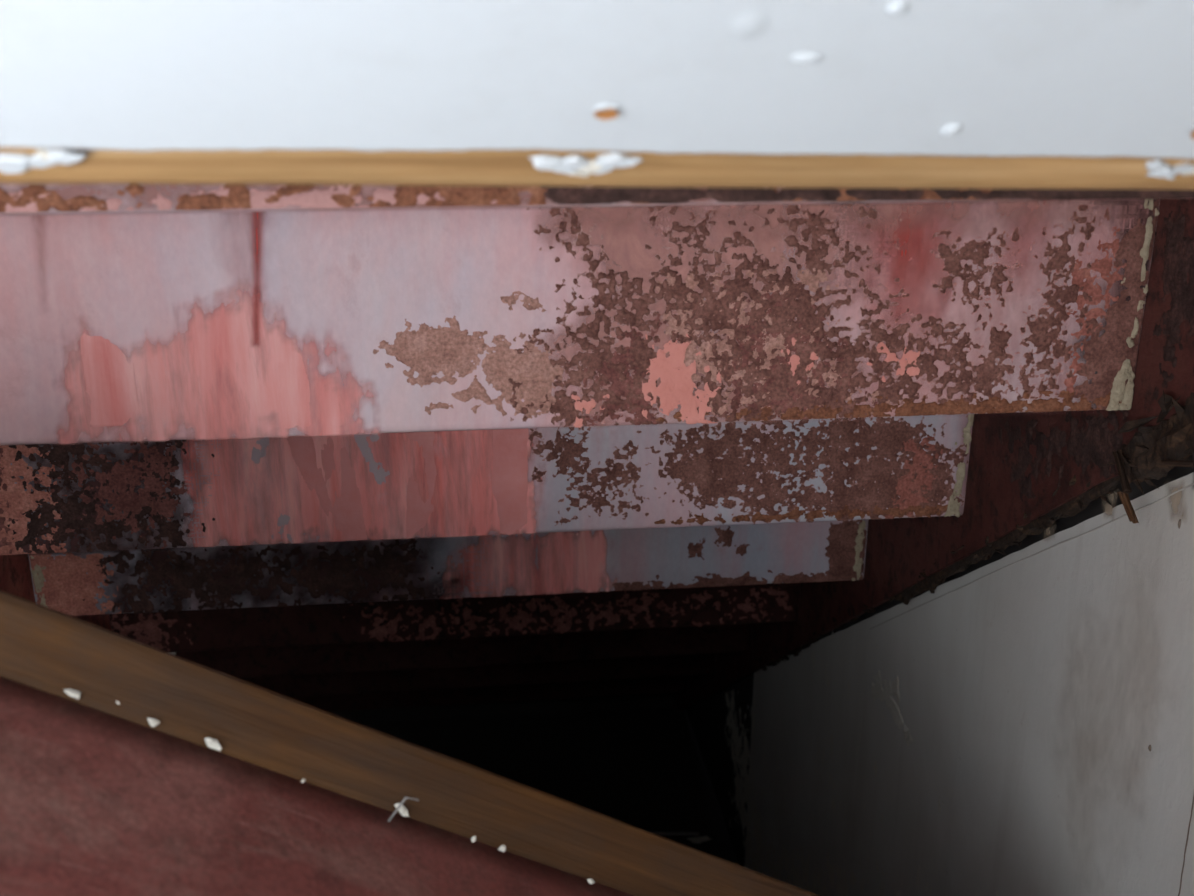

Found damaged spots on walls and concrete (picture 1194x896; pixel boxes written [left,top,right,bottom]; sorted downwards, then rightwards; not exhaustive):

peeling [58,290,616,599]
corrosion [0,184,1194,652]
peeling [642,334,721,424]
peeling [781,337,818,385]
peeling [867,342,920,382]
crack [1178,795,1194,896]